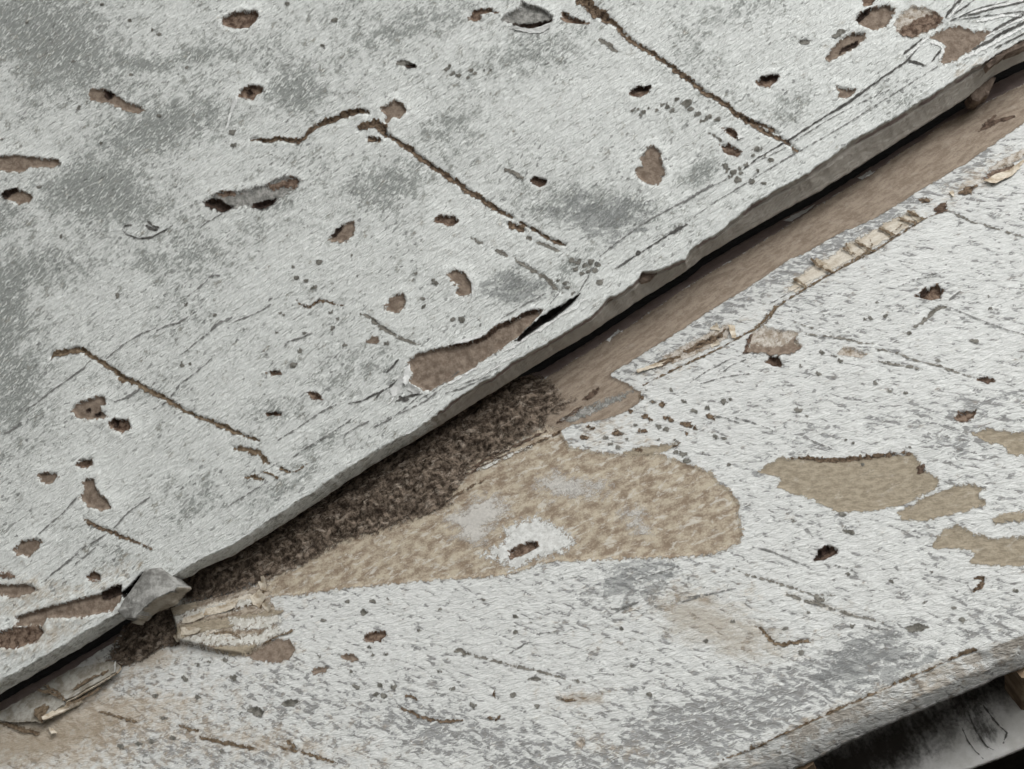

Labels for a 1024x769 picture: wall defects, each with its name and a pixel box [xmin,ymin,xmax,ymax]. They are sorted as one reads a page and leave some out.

crack [575,0,799,153]
peeling [825,0,991,64]
crack [250,107,566,294]
crack [4,274,421,481]
peeling [173,84,1024,642]
peeling [0,571,123,649]
peeling [246,638,295,664]